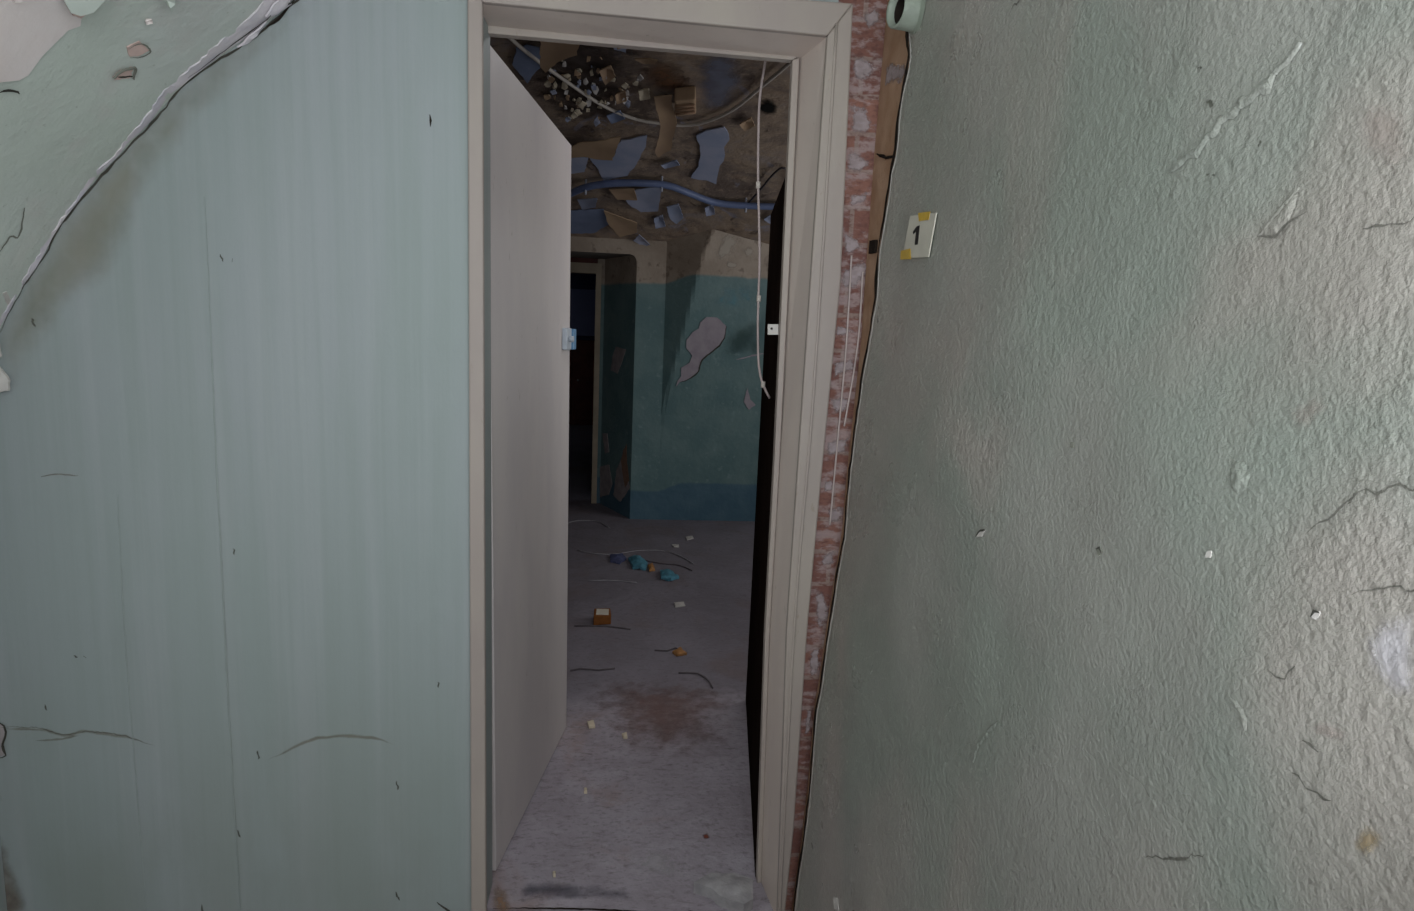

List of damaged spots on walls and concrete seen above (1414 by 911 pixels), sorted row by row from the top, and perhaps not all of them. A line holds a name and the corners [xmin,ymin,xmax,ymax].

peeling [0,0,105,94]
spalling [113,41,151,80]
crack [1363,217,1414,229]
peeling [0,347,11,393]
peeling [676,317,727,386]
crack [1309,469,1414,531]
crack [1355,585,1414,593]